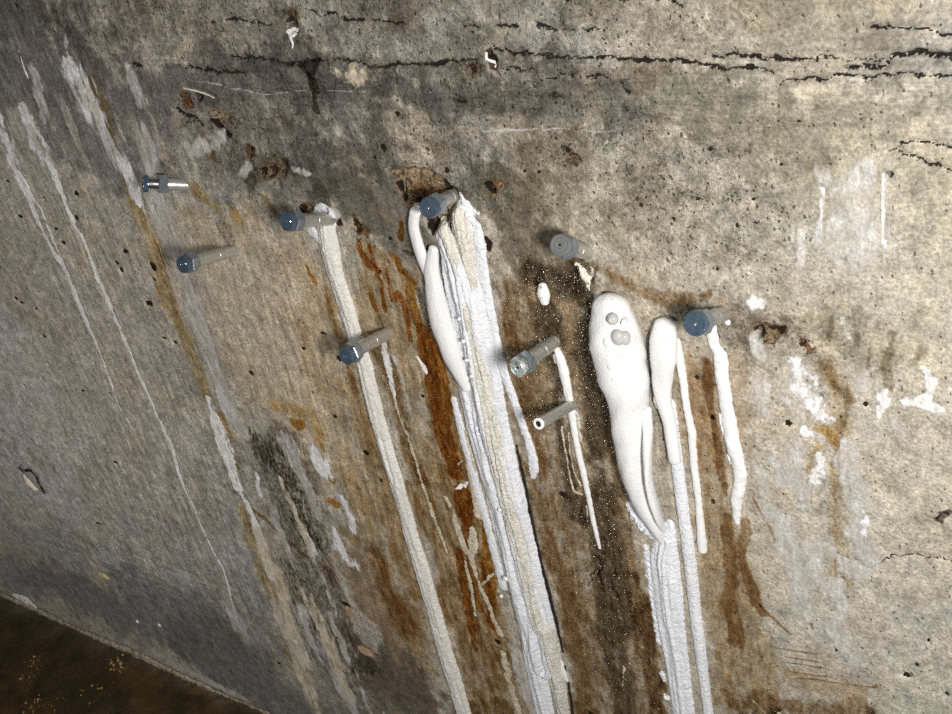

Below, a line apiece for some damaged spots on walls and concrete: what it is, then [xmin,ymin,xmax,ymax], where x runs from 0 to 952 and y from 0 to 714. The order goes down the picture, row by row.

crack [176,107,204,126]
crack [226,17,272,26]
crack [310,9,404,25]
crack [185,22,952,98]
crack [888,141,952,172]
damp [0,50,248,637]
damp [60,34,375,714]
damp [375,342,448,553]
rust [357,239,496,653]
damp [443,431,507,637]
damp [504,283,655,661]
damp [500,646,536,714]